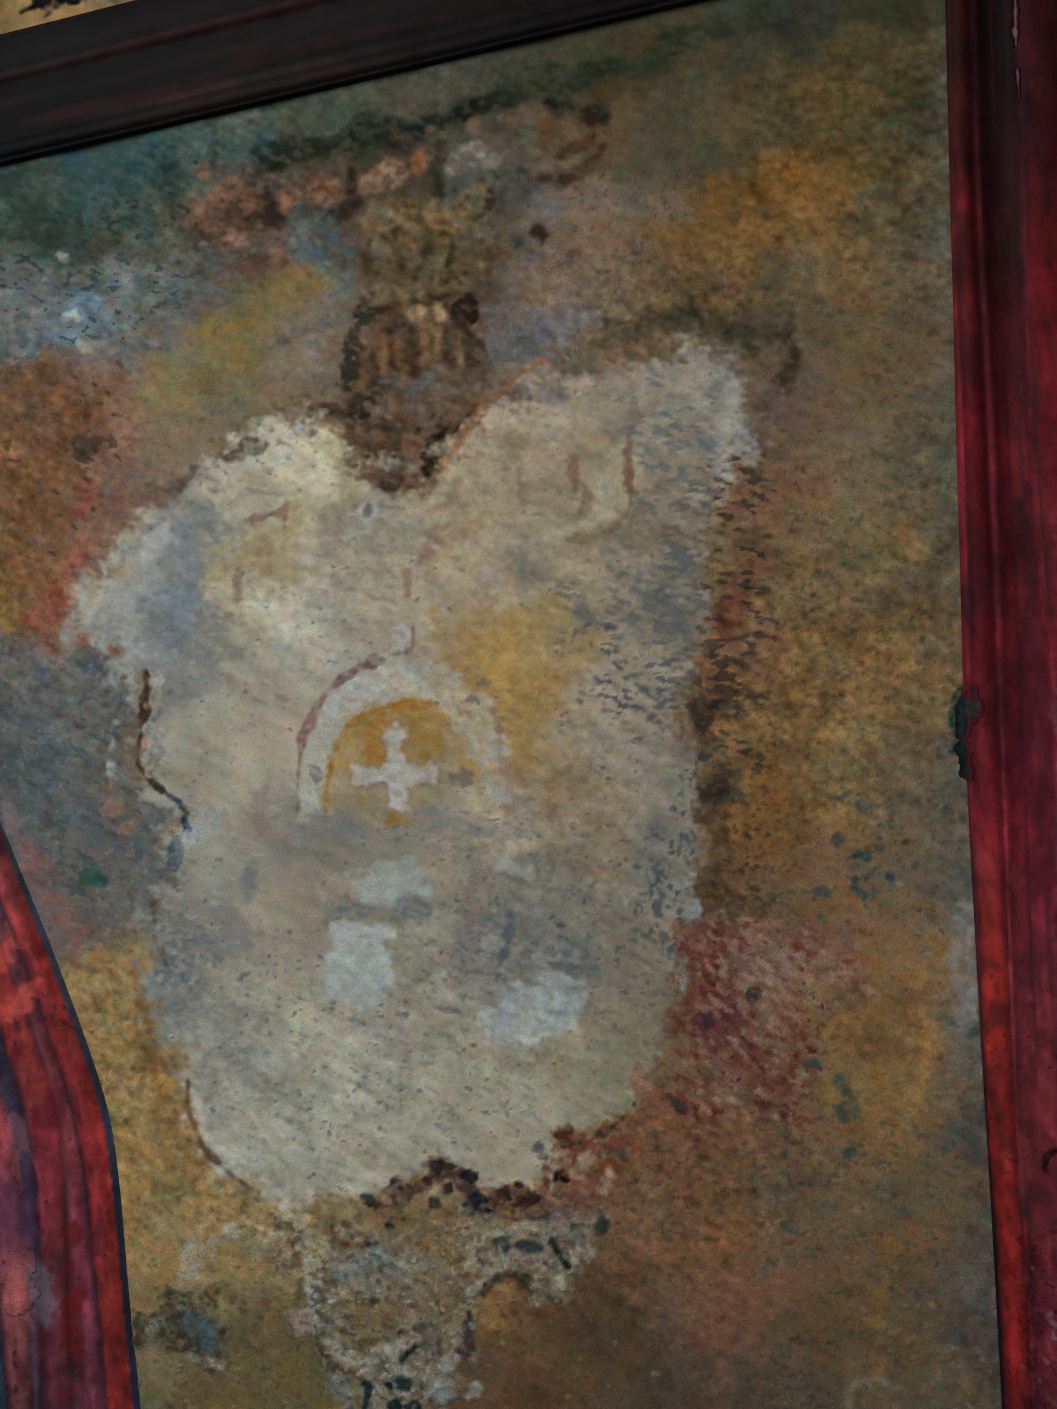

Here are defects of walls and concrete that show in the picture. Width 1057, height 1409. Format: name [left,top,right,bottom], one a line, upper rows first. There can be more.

crack [96,667,208,970]
peeling [43,293,884,1409]
peeling [0,1246,40,1319]